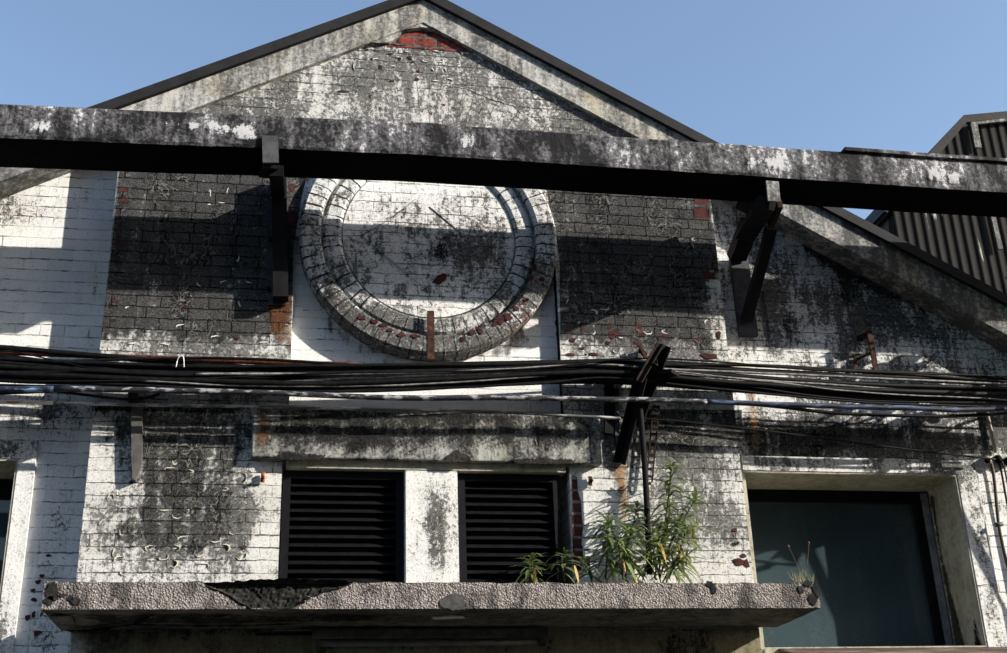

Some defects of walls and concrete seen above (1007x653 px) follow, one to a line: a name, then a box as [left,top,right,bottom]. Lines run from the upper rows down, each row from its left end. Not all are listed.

flaking render [370,23,474,107]
water stain [801,244,956,327]
water stain [781,309,804,349]
water stain [95,406,131,446]
water stain [268,384,590,455]
water stain [644,409,952,458]
water stain [114,407,252,558]
rust [615,463,629,521]
spalling [205,578,350,610]